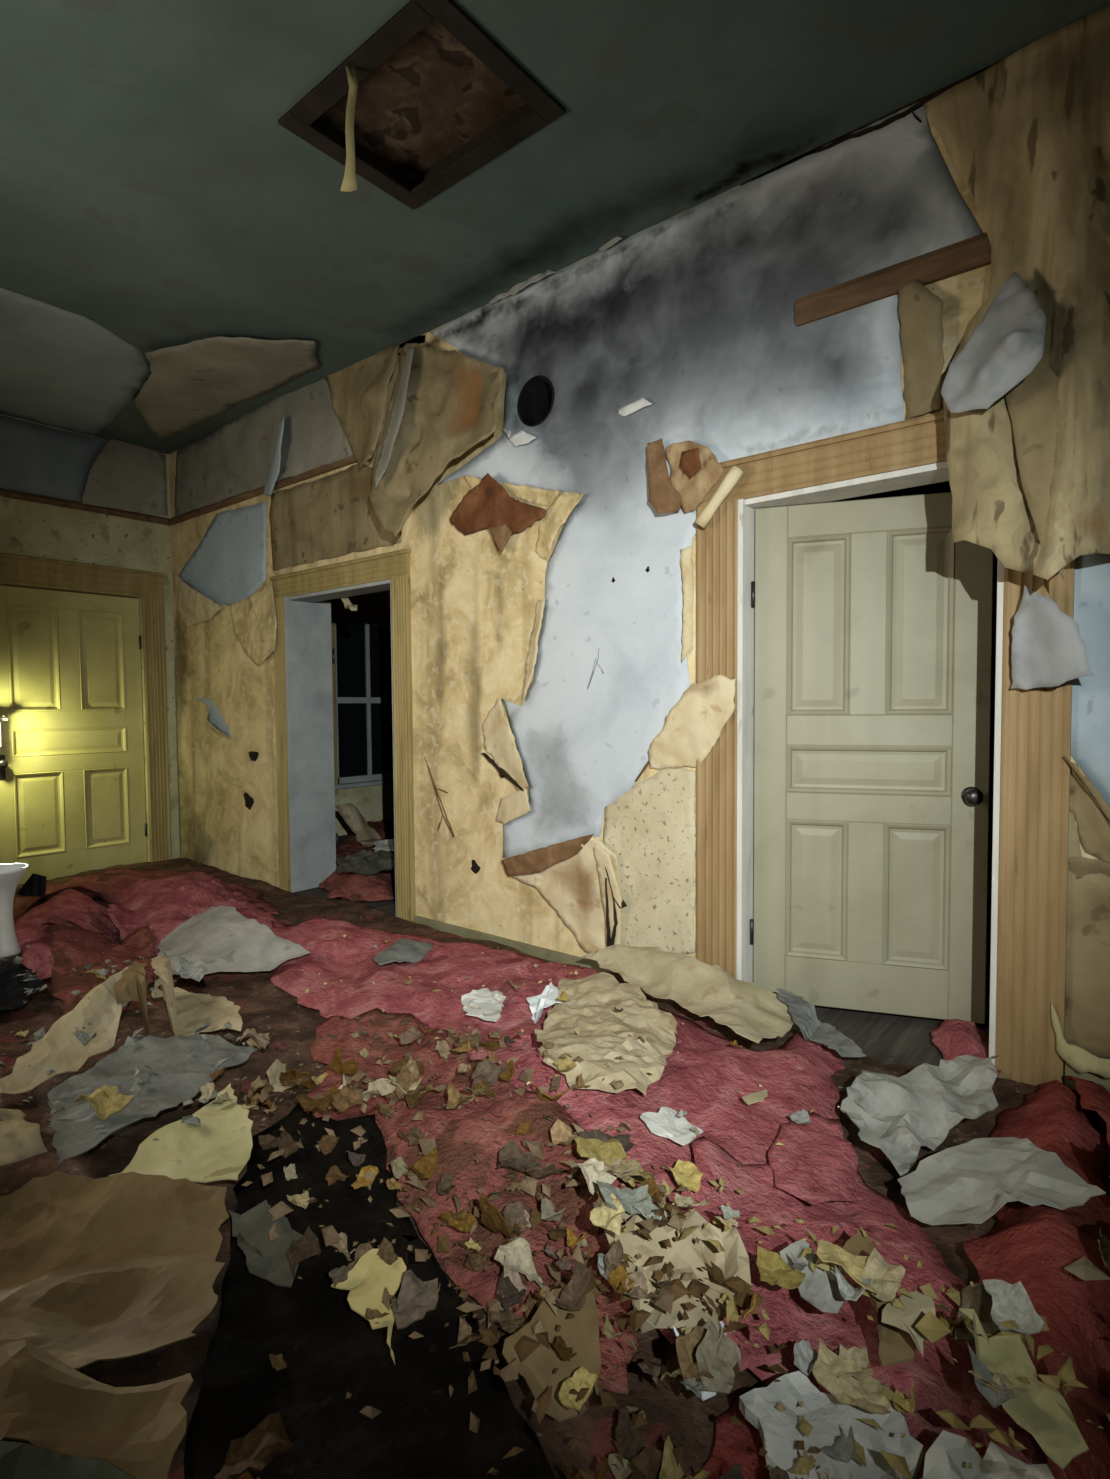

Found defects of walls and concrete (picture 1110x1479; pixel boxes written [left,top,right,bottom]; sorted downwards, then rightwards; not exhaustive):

flaking render [0,287,152,502]
flaking render [177,502,277,666]
flaking render [430,102,982,858]